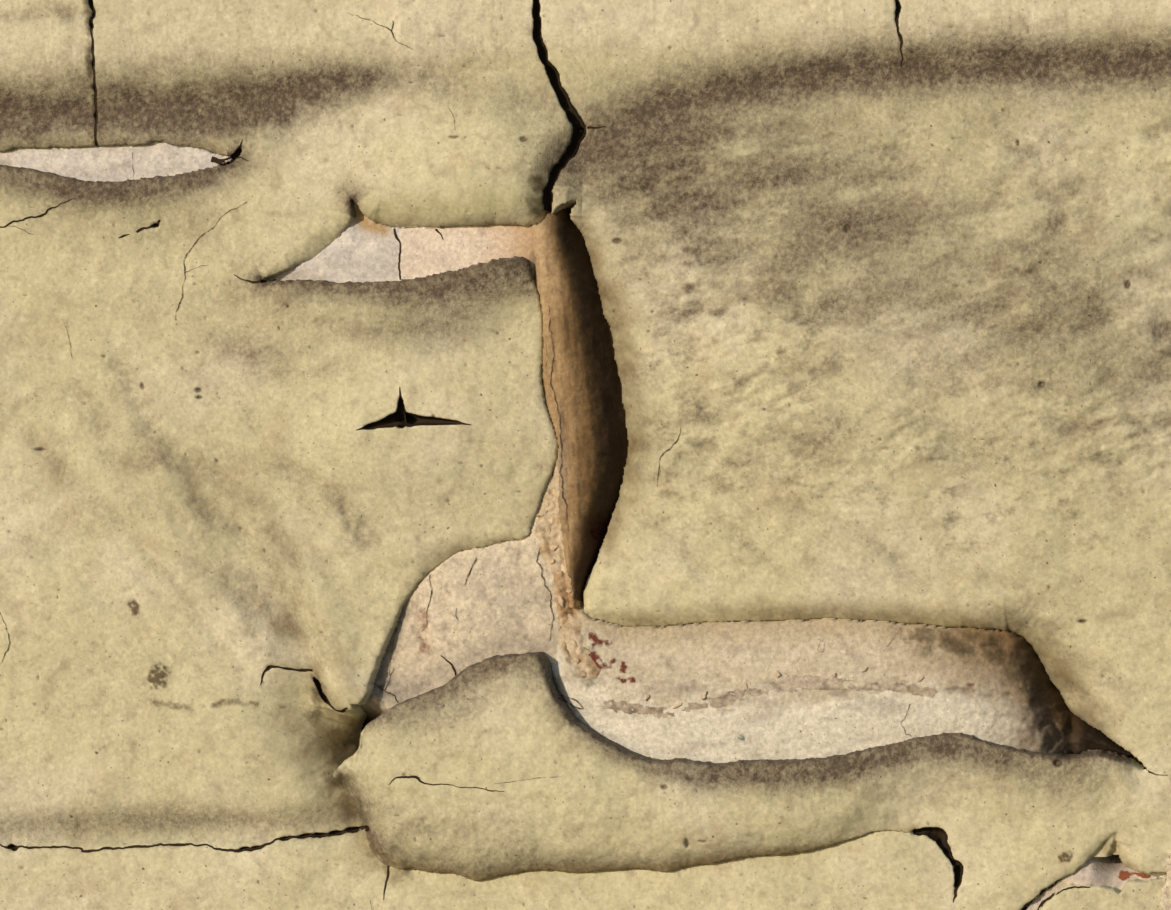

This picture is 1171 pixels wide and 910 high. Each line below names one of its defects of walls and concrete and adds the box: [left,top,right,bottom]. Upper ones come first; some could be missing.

crack [895,0,903,67]
crack [88,0,99,146]
crack [532,0,606,212]
peeling [0,141,232,182]
crack [357,411,471,430]
peeling [265,201,1141,765]
crack [260,665,348,713]
crack [0,826,369,853]
peeling [1026,851,1171,910]